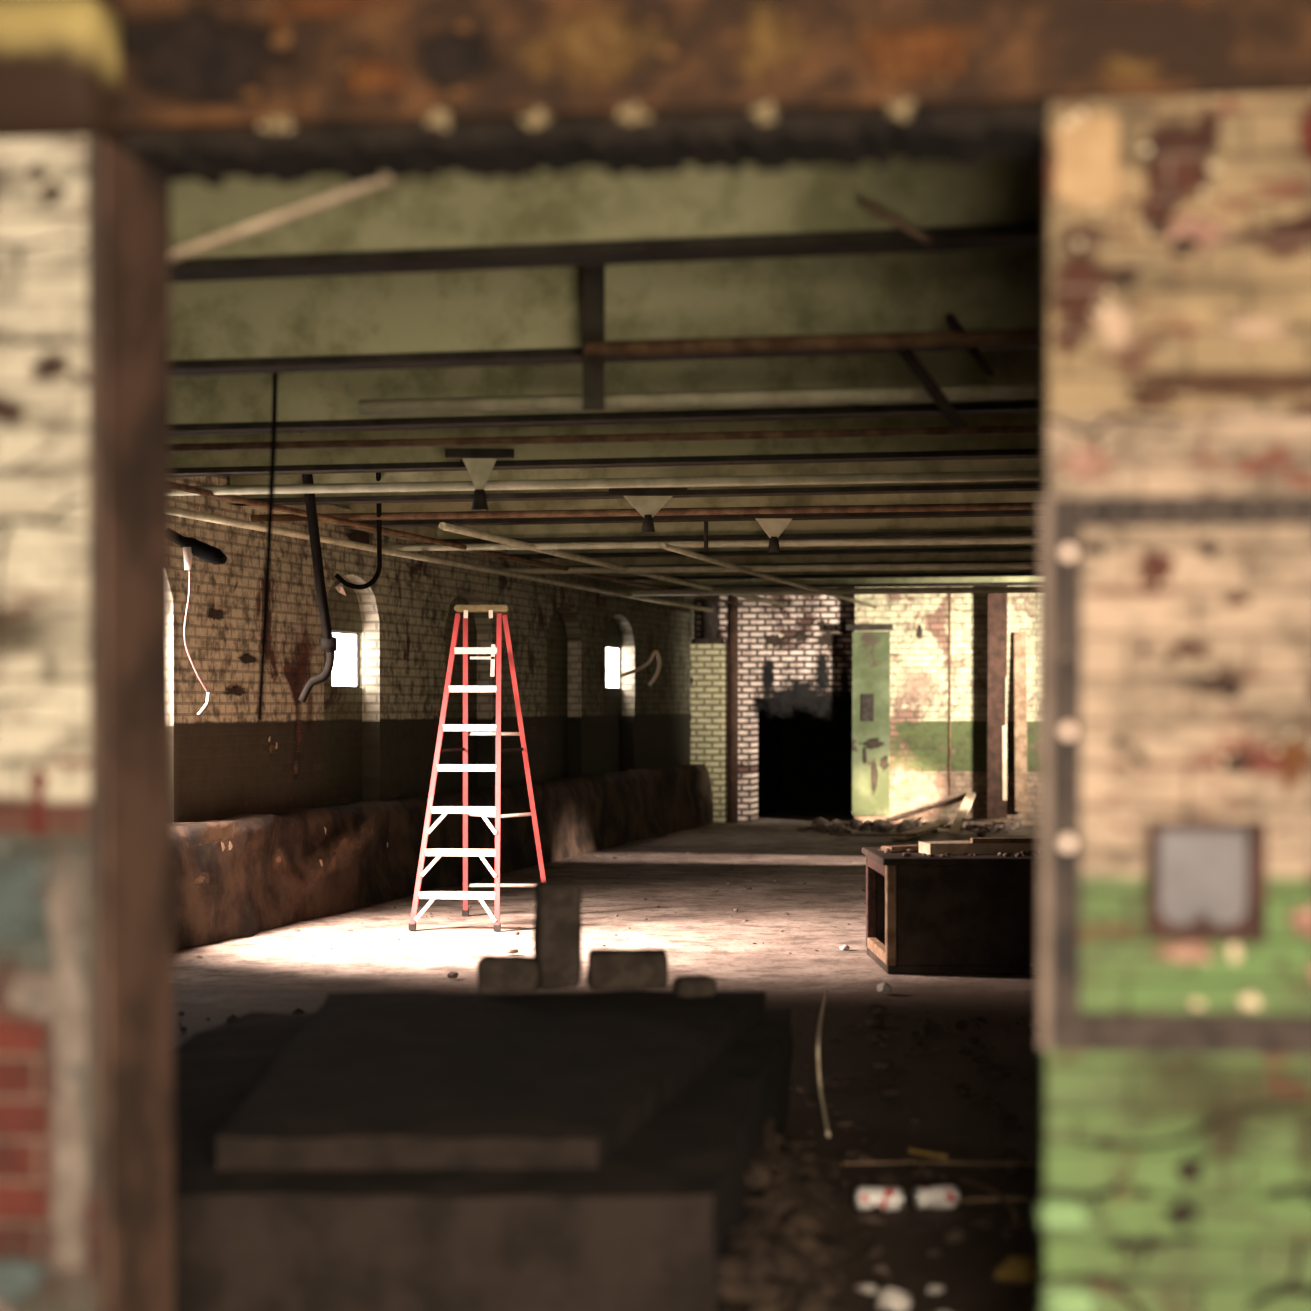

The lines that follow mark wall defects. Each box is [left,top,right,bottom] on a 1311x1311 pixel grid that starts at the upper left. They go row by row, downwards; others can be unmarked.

peeling [1300,107,1311,160]
spalling [1139,108,1220,255]
peeling [1054,110,1141,351]
peeling [1229,212,1311,257]
spalling [1129,371,1311,416]
peeling [890,767,949,816]
peeling [0,849,100,1311]